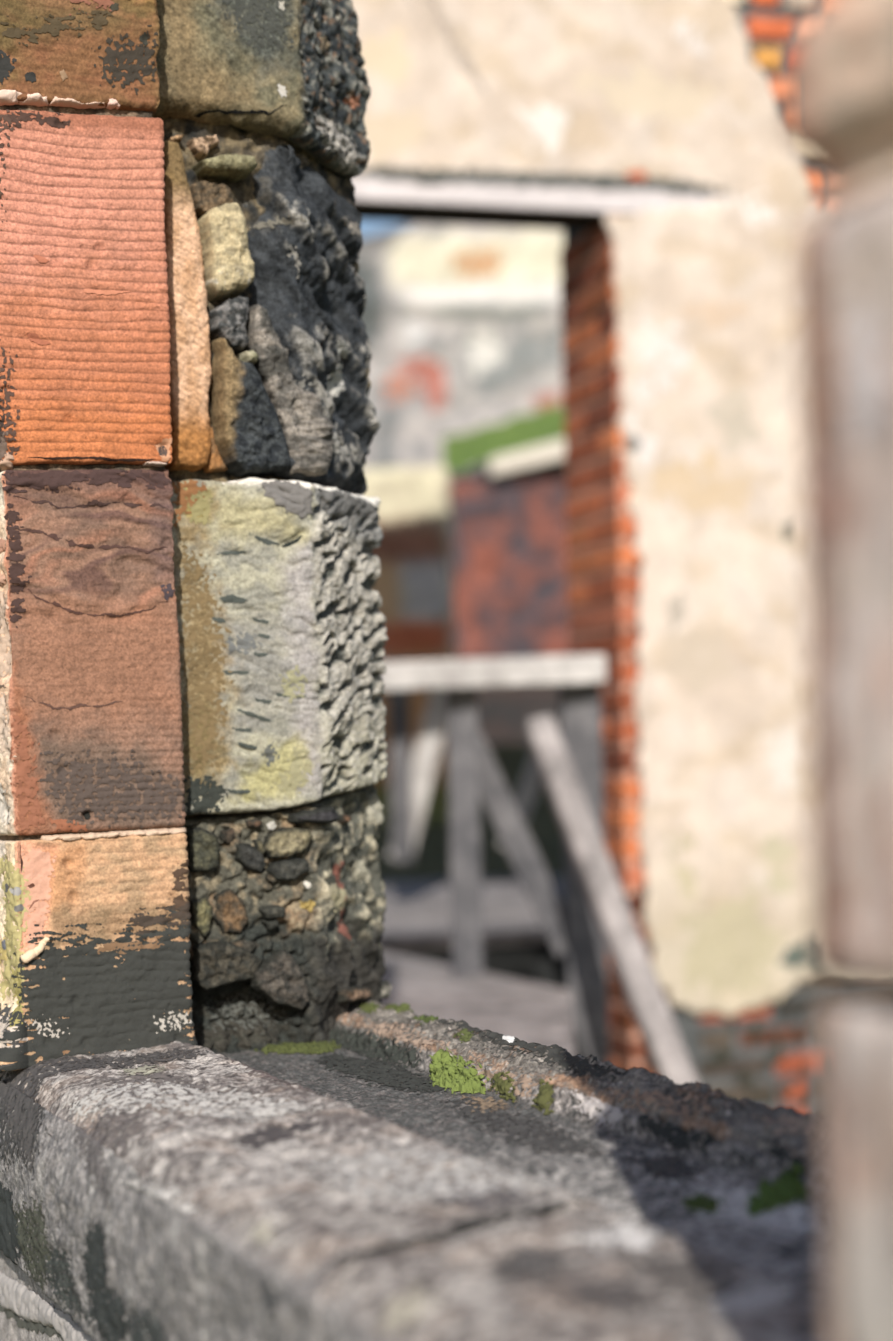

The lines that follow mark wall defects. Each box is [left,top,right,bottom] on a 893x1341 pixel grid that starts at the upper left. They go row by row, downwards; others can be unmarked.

leakage [0,3,158,95]
leakage [206,0,299,61]
crack [194,105,283,118]
leakage [37,745,228,829]
leakage [0,859,220,1341]
crack [333,1199,588,1267]